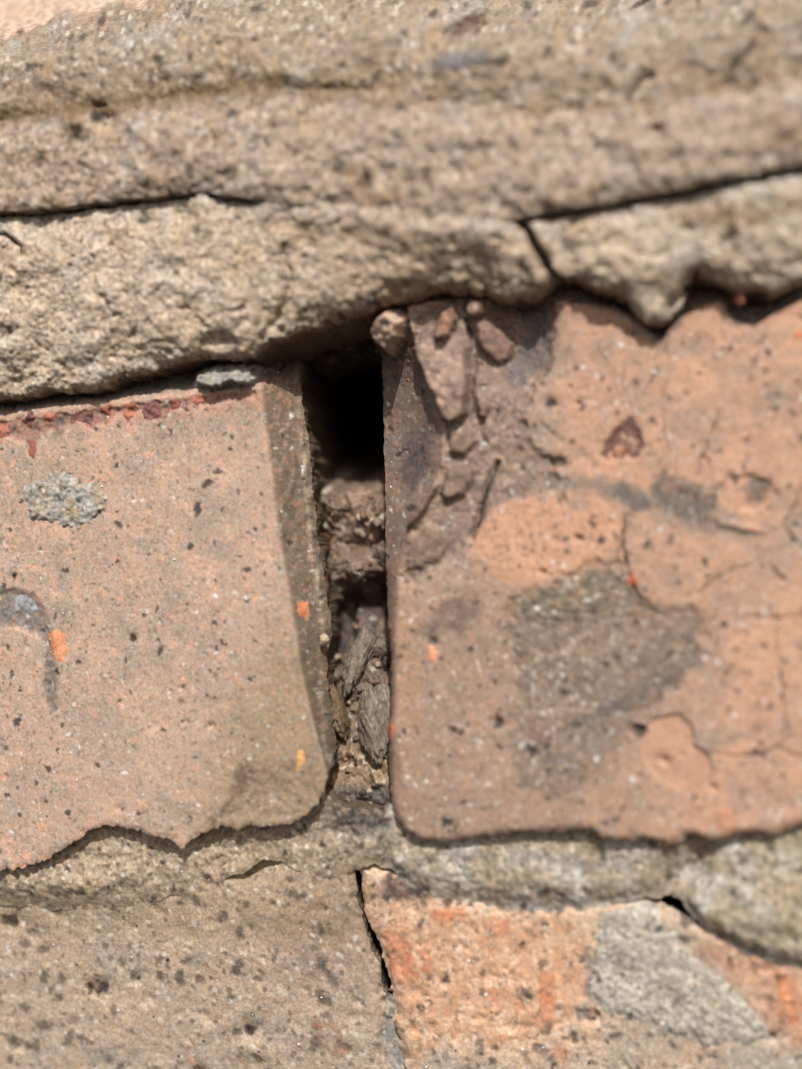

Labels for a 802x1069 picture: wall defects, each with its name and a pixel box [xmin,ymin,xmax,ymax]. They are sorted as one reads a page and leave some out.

crack [0,192,242,254]
crack [521,165,802,281]
crack [617,518,641,598]
crack [695,611,802,758]
crack [355,870,393,995]